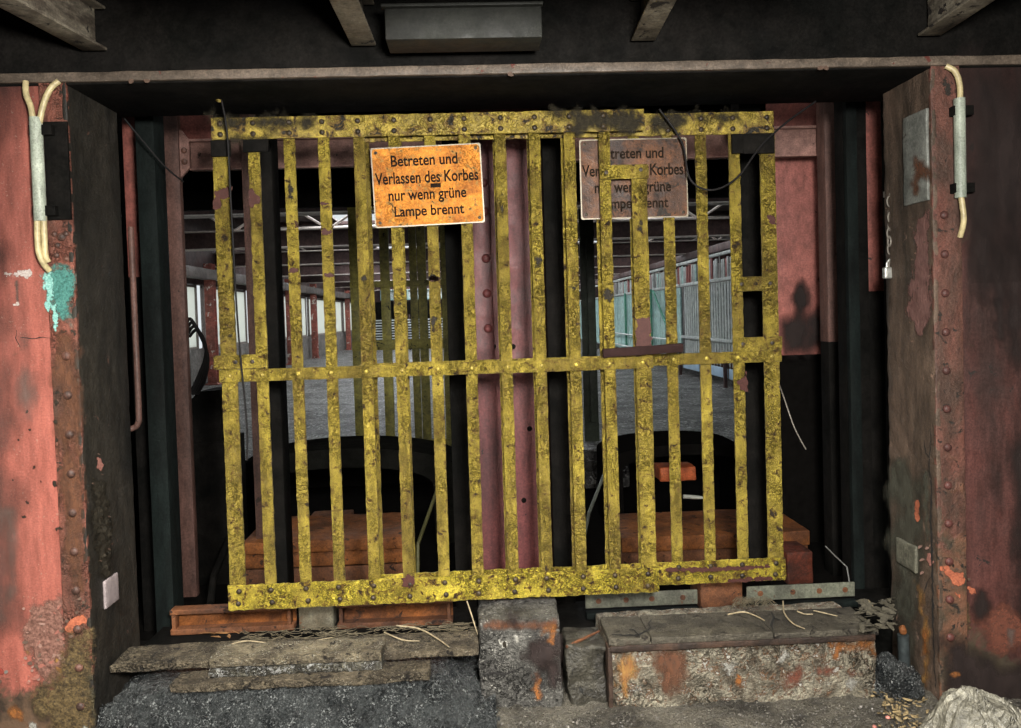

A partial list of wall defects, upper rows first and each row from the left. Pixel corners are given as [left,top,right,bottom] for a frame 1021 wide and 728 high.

corrosion [911,157,932,195]
peeling [918,545,976,598]
peeling [22,596,87,685]
leakage [973,590,991,619]
corrosion [967,603,1021,656]
corrosion [8,628,94,728]
corrosion [620,656,635,697]
corrosion [654,650,686,694]